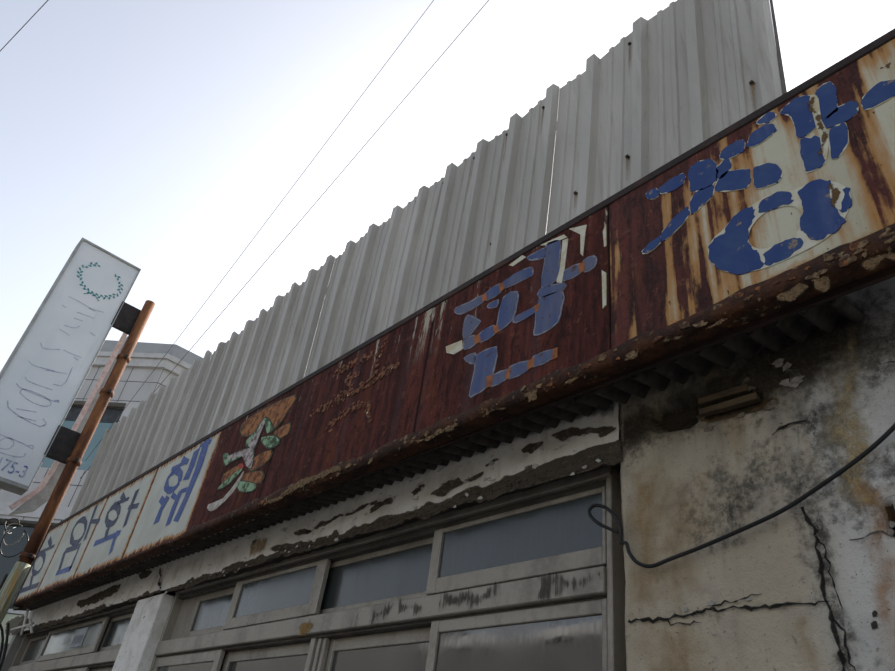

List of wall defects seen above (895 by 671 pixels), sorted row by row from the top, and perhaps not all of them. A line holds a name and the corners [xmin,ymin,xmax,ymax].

flaking render [772,358,805,388]
peeling [5,426,623,635]
crack [628,507,856,671]
flaking render [832,378,895,537]
crack [849,530,893,541]